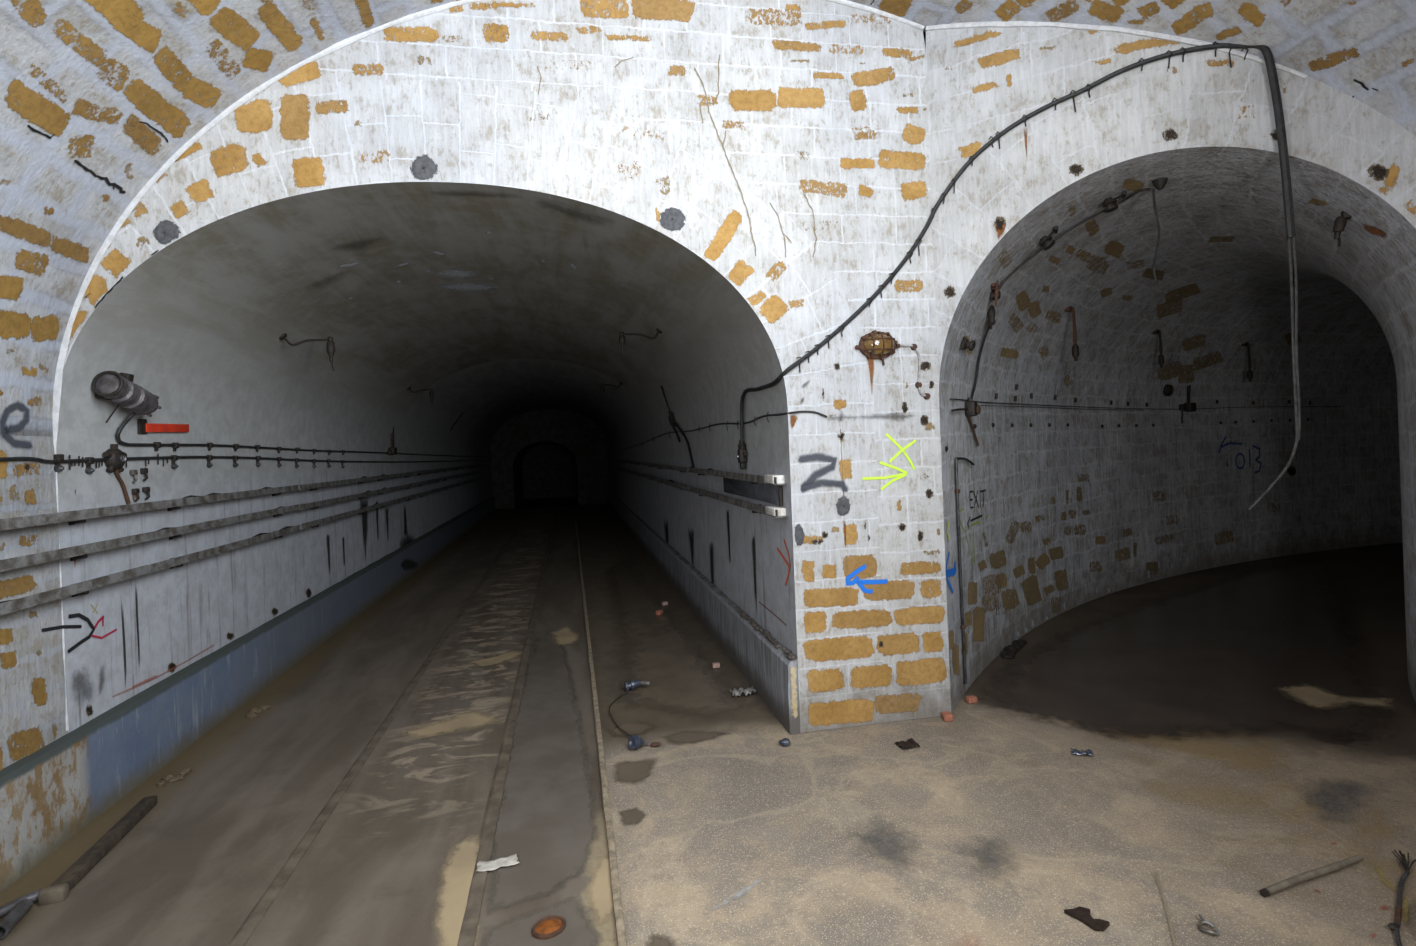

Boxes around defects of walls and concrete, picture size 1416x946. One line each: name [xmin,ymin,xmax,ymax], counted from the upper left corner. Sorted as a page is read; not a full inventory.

peeling [655,176,670,221]
crack [694,55,817,257]
peeling [1009,285,1062,360]
peeling [902,382,935,430]
damp [121,591,140,682]
peeling [790,474,1159,727]